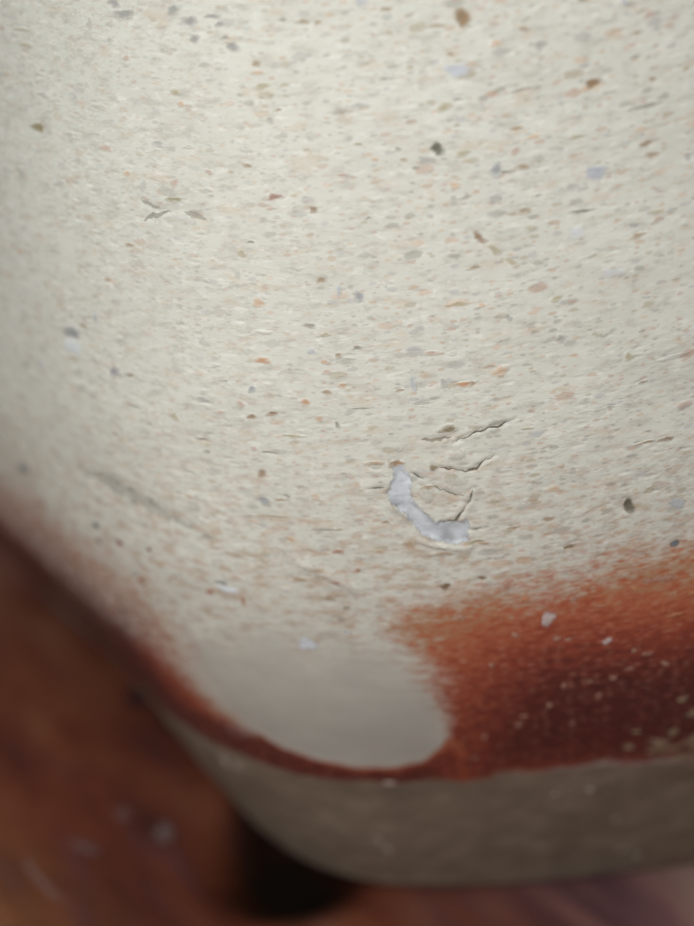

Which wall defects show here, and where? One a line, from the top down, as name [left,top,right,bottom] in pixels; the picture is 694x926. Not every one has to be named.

rust [0,448,694,792]
crack [362,420,510,557]